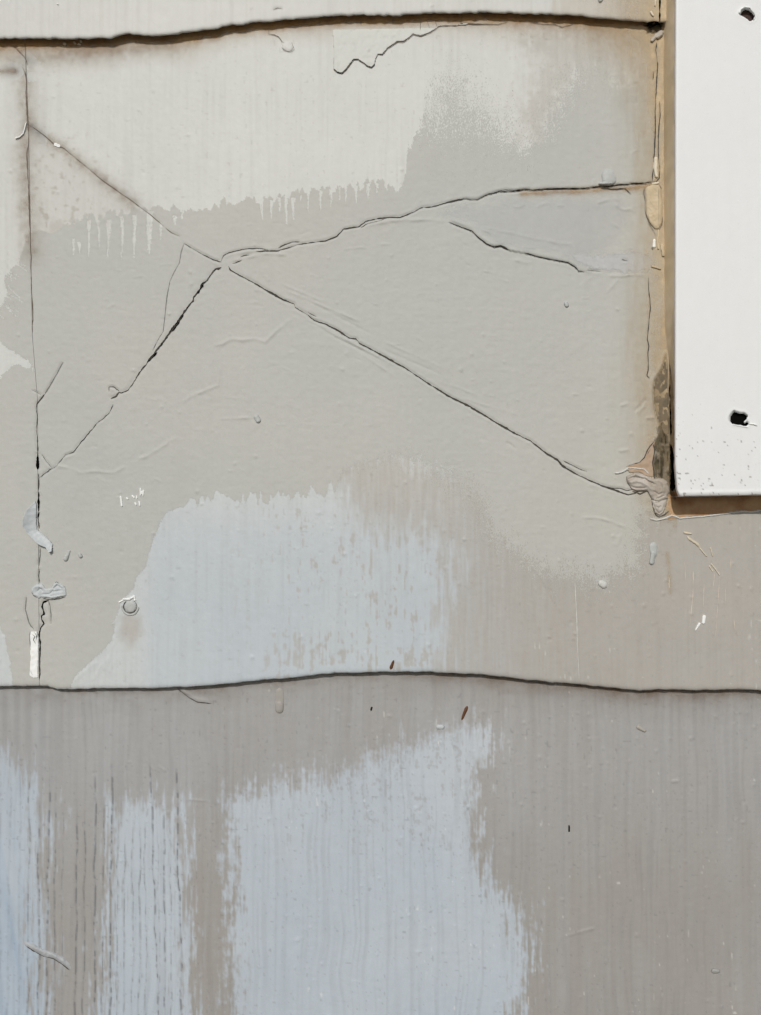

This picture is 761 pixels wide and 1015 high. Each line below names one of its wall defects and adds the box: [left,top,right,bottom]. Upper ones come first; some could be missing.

peeling [333,22,506,74]
crack [16,0,663,529]
crack [647,279,675,491]
crack [25,557,51,678]